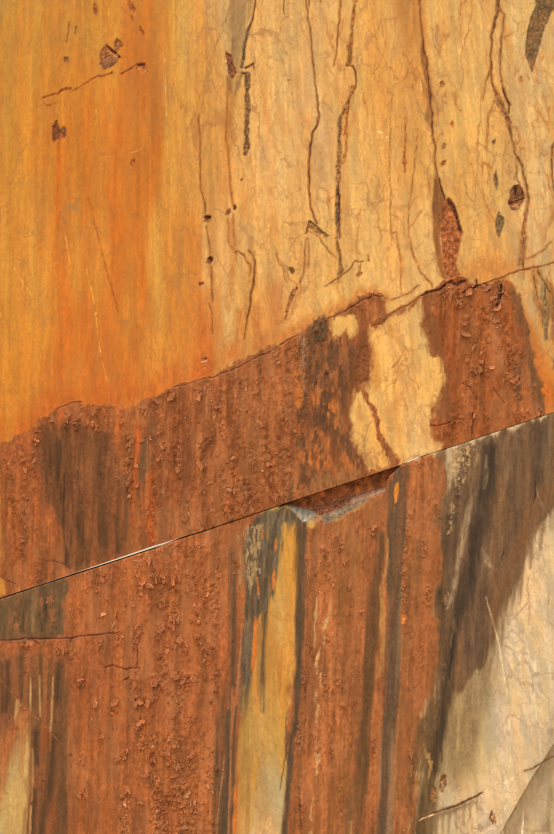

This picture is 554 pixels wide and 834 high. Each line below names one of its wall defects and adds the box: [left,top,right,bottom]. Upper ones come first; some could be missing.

spalling [99,38,123,70]
corrosion [0,77,399,472]
crack [173,0,370,388]
crack [315,0,554,372]
corrosion [431,174,446,280]
spalling [508,184,525,211]
spalling [517,0,554,85]
damp [0,418,131,834]
corrosion [233,524,300,834]
damp [343,465,411,834]
damp [406,288,554,834]
crack [417,745,554,834]